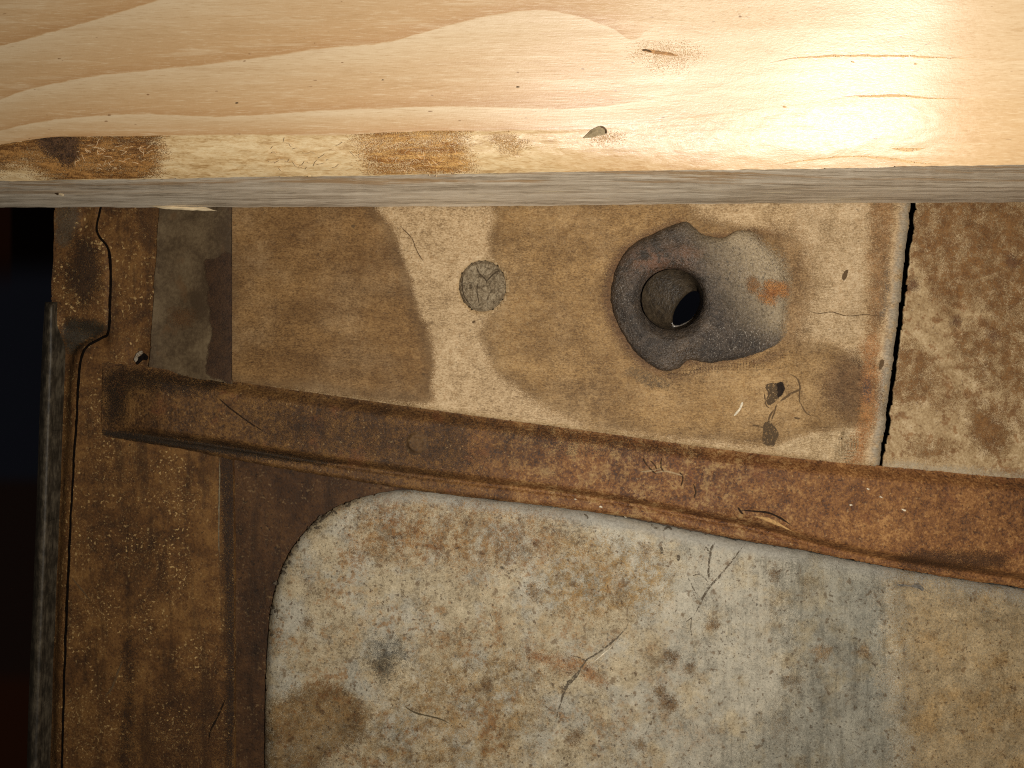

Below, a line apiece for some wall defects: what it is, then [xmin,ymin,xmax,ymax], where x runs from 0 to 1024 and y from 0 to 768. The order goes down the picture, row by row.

water stain [232,206,437,406]
water stain [477,204,887,451]
crack [808,203,916,465]
crack [61,207,112,768]